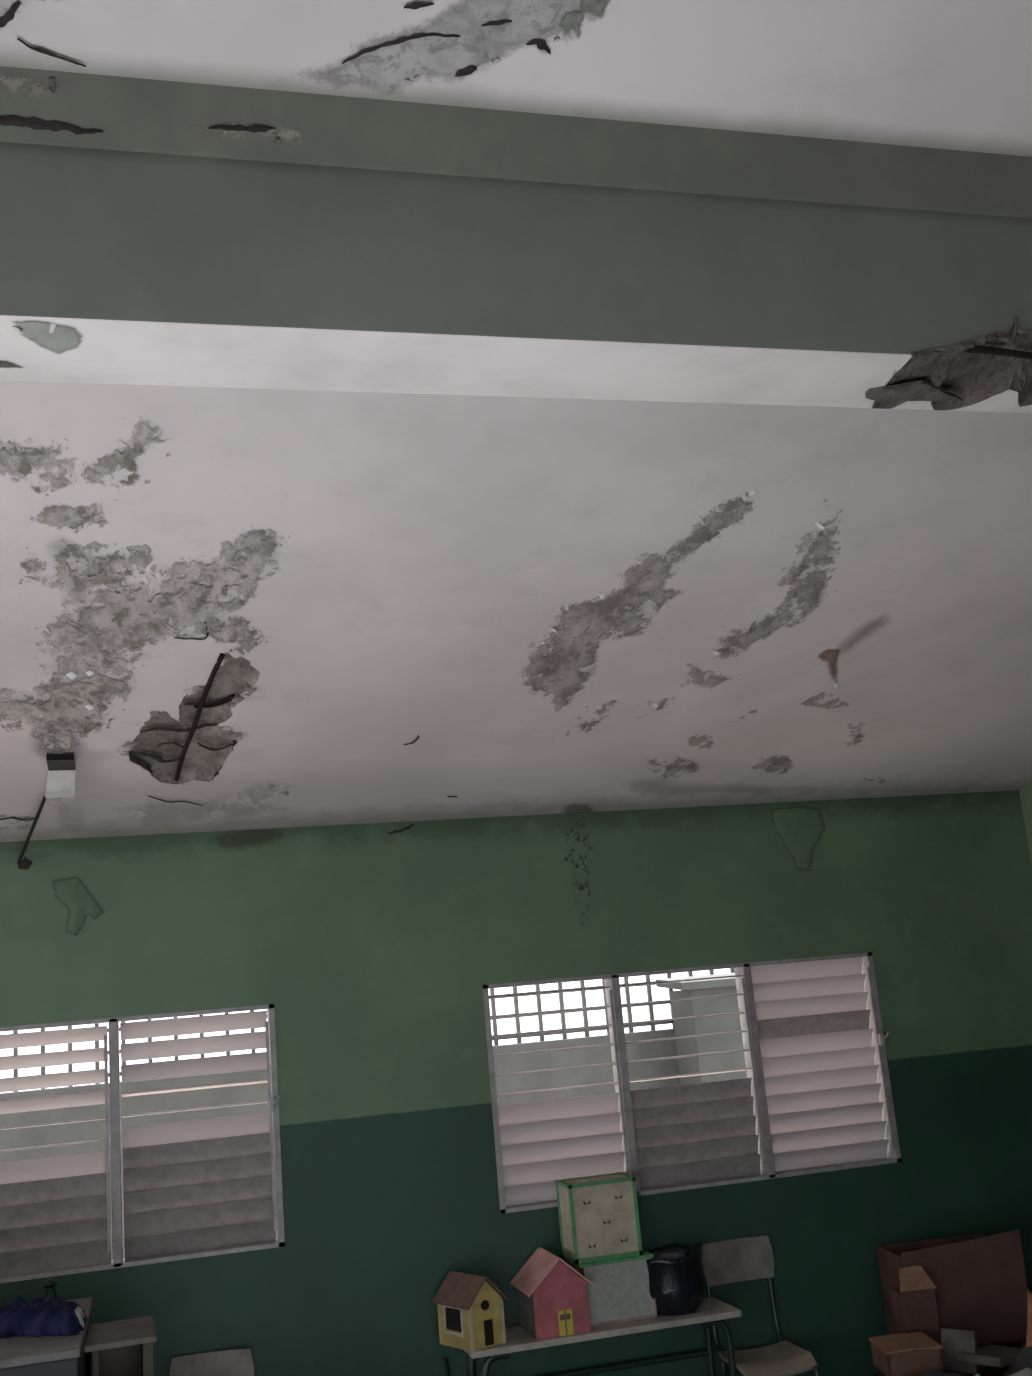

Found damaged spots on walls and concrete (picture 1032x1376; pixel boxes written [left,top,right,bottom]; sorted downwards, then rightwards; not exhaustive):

peeling [0,0,45,17]
crack [0,1,86,67]
crack [342,2,551,77]
peeling [319,0,610,92]
crack [0,116,103,135]
crack [208,124,275,133]
peeling [12,321,81,353]
spalling [865,315,1032,411]
peeling [0,418,290,787]
peeling [516,489,757,735]
peeling [648,499,842,710]